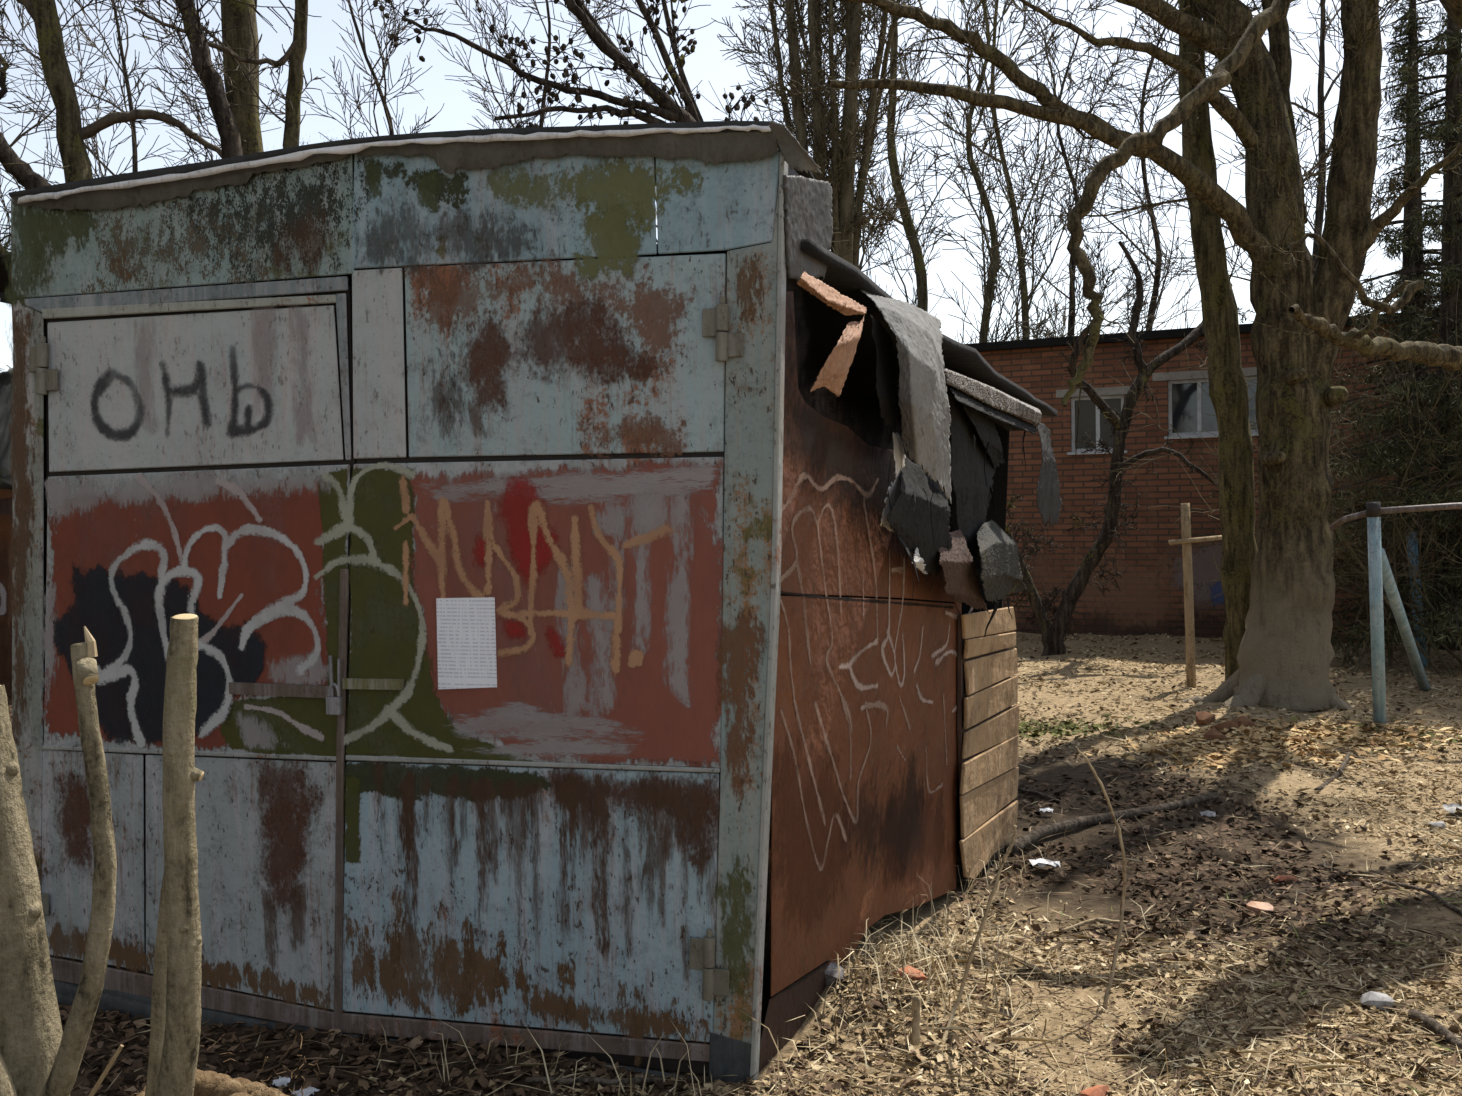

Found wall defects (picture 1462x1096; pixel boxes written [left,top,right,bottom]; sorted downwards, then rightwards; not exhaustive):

rust [404,259,695,438]
rust [579,411,686,457]
rust [57,772,92,867]
rust [518,610,765,956]
rust [47,922,87,962]
rust [109,936,155,974]
rust [201,760,711,1067]